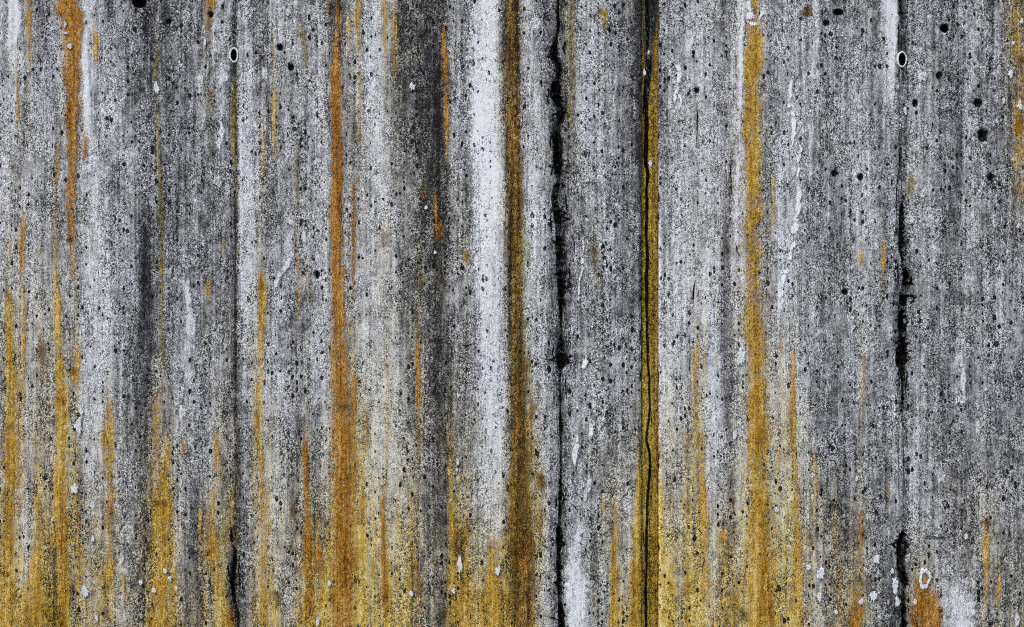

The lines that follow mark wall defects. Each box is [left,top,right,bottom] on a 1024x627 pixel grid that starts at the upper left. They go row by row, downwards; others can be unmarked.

corrosion [0,0,127,627]
corrosion [146,395,185,627]
corrosion [198,487,235,627]
corrosion [288,0,369,627]
water stain [394,1,448,249]
corrosion [456,0,546,627]
crack [543,1,580,627]
corrosion [602,467,642,627]
crack [643,0,652,627]
corrosion [722,0,776,627]
crack [887,144,925,627]
corrosion [910,576,945,627]